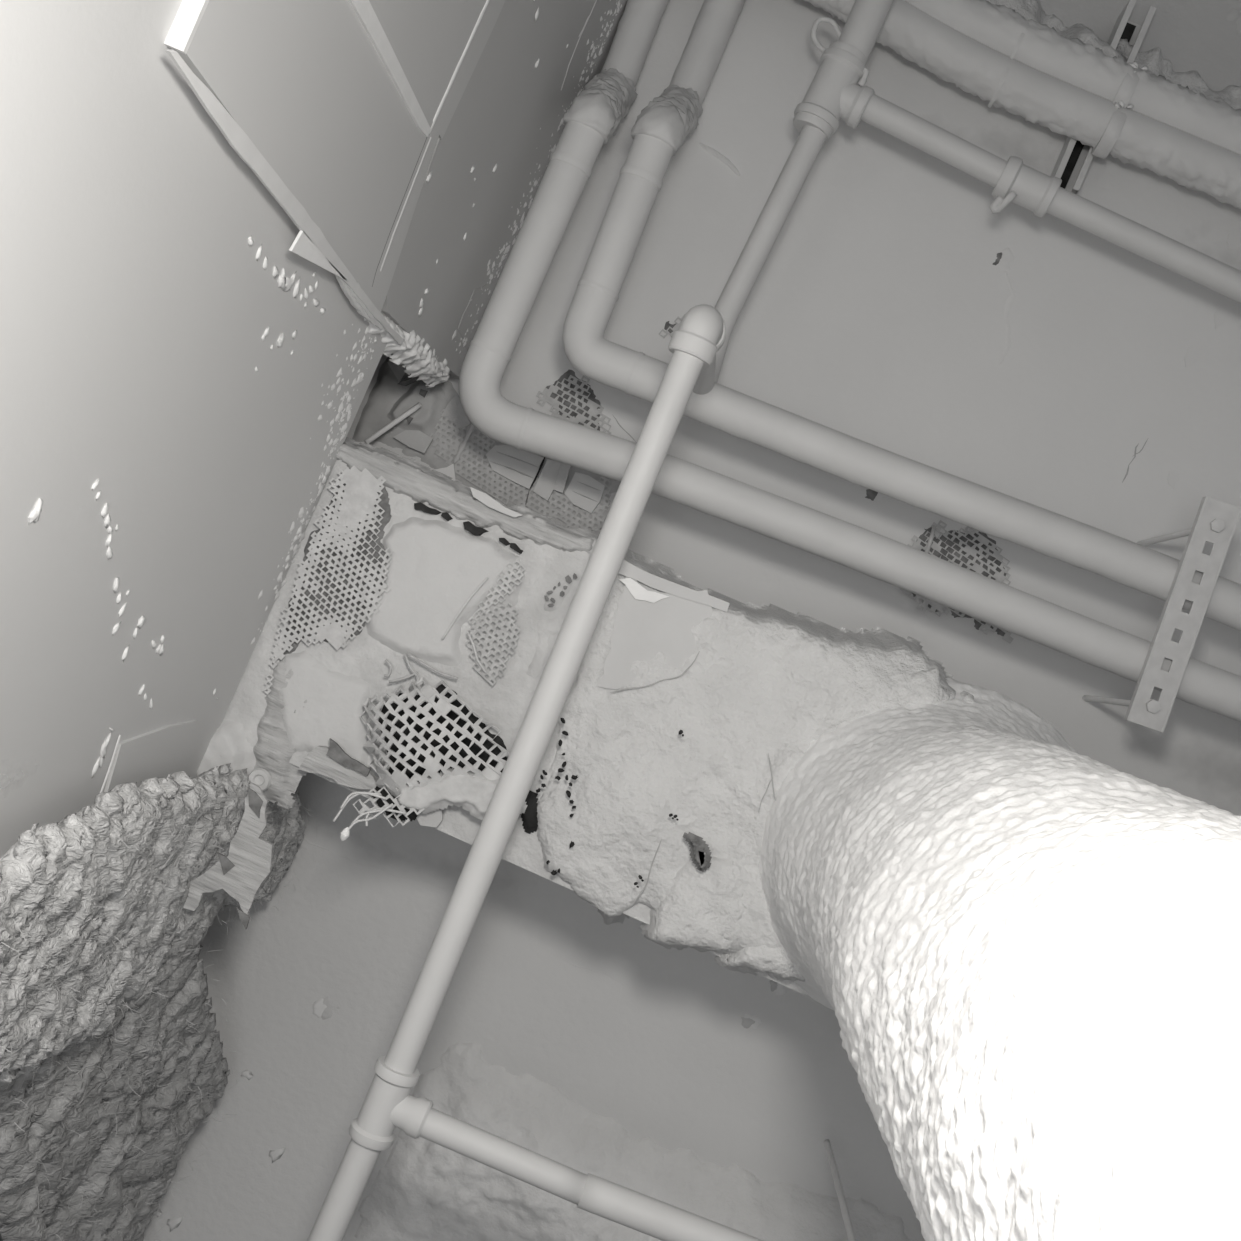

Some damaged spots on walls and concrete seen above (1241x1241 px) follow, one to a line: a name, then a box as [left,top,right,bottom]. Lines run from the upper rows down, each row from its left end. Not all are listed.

spalling [536,370,611,434]
flaking render [470,487,523,518]
spalling [908,520,1011,586]
spalling [253,466,394,809]
spalling [441,560,526,686]
spalling [543,573,578,612]
spalling [900,588,1013,643]